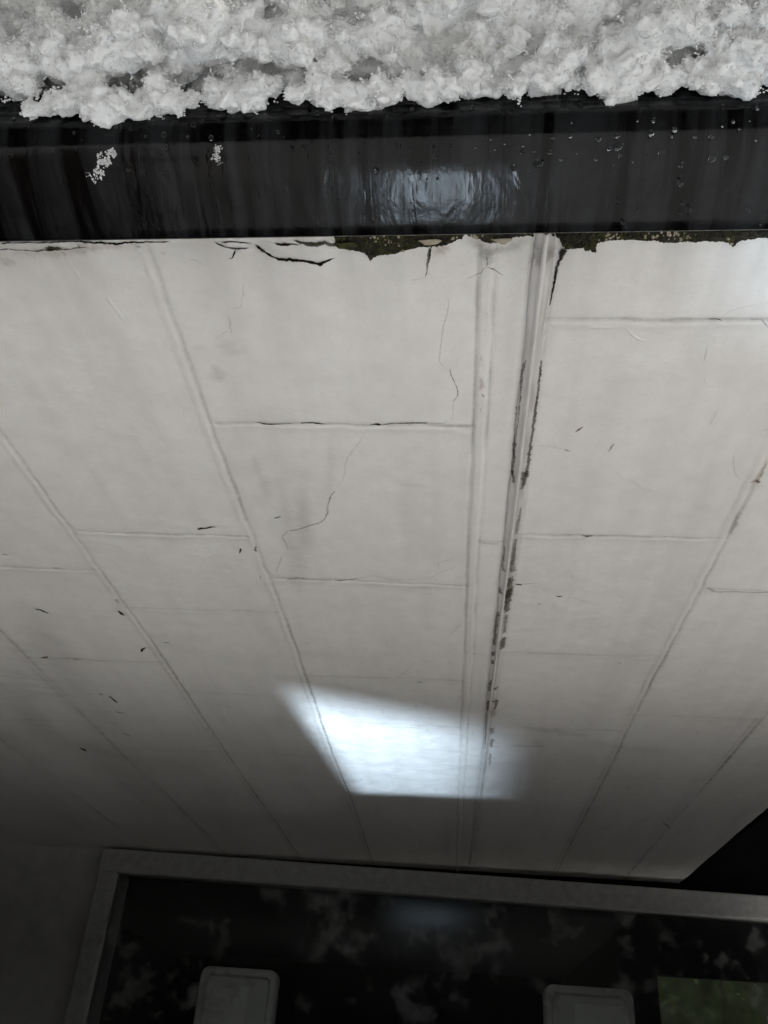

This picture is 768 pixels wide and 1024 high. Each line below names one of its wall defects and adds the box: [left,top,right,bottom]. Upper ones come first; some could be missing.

crack [216,240,338,266]
spalling [334,234,534,262]
spalling [547,230,768,253]
damp [511,361,542,488]
damp [491,529,517,664]